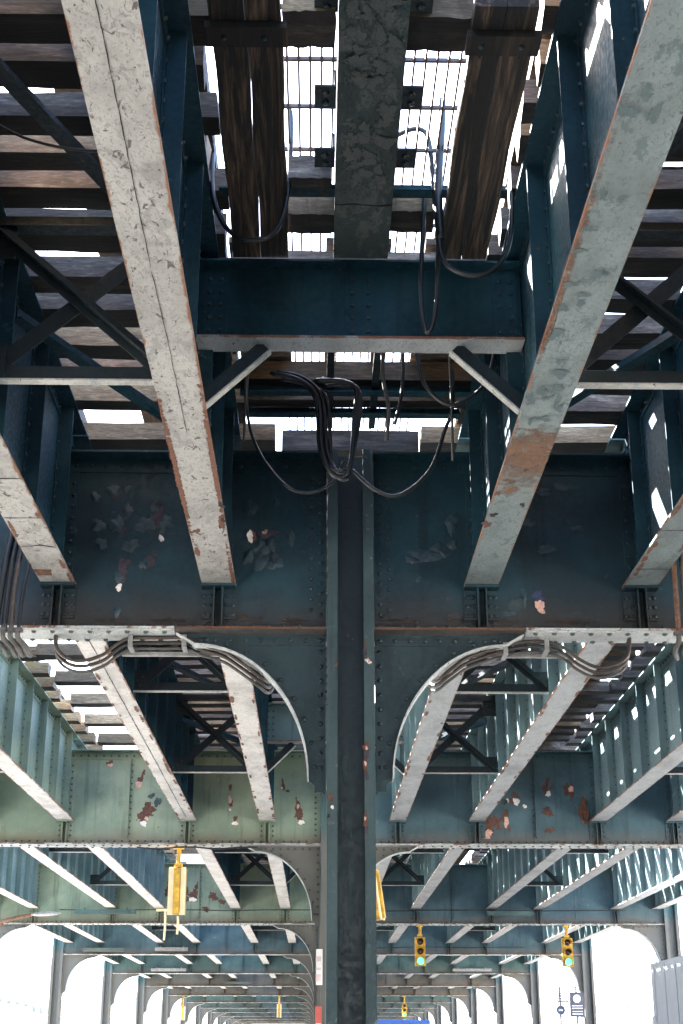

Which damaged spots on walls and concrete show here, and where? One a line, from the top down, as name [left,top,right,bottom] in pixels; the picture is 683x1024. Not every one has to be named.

corrosion [500,429,557,494]
peeling [114,500,173,592]
peeling [241,528,295,571]
peeling [502,588,546,616]
peeling [136,802,157,827]
peeling [228,784,238,825]
peeling [281,779,305,825]
peeling [476,792,527,839]
peeling [540,777,575,834]
peeling [186,882,226,913]